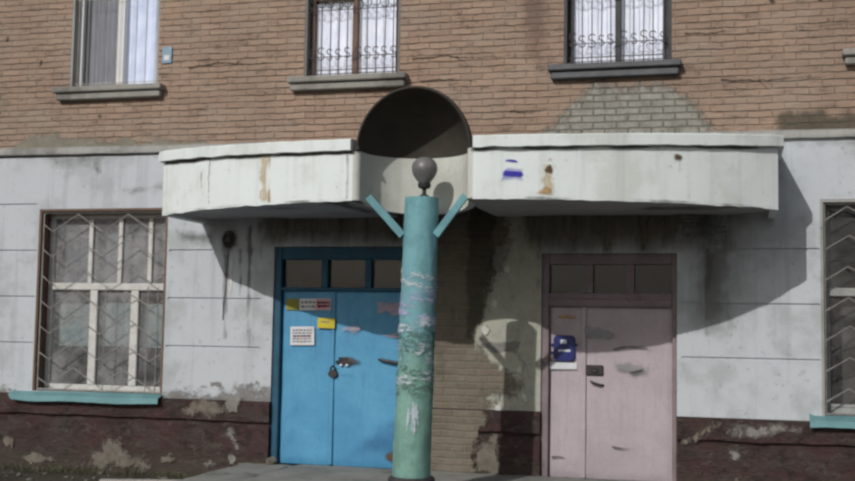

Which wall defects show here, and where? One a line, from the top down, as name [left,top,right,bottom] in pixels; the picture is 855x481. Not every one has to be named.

corrosion [261,158,270,202]
corrosion [540,165,552,193]
spalling [431,209,527,474]
peeling [163,381,270,419]
peeling [406,396,419,435]
spalling [682,422,801,444]
spalling [22,452,54,465]
spalling [76,437,175,473]